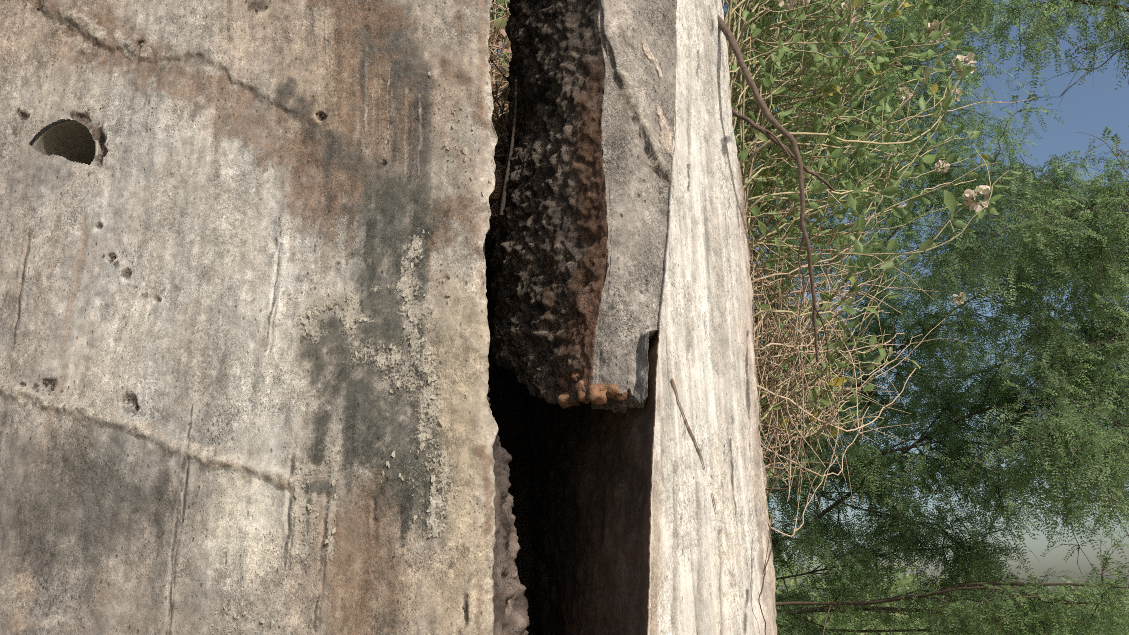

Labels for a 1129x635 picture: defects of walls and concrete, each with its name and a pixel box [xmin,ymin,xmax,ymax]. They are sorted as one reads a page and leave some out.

spalling [71,107,108,175]
water stain [275,1,442,543]
water stain [42,611,63,626]
crack [166,403,194,634]